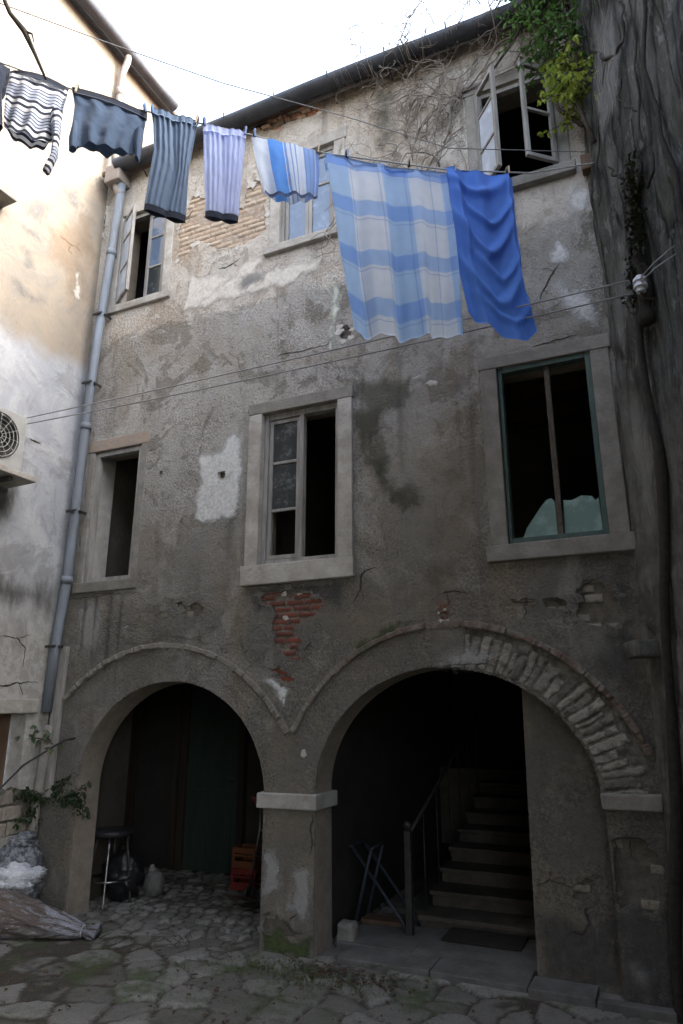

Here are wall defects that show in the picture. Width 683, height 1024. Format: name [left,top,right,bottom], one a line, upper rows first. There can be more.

flaking render [174,176,270,264]
crack [540,265,559,301]
spalling [333,324,355,344]
damp [357,378,415,507]
crack [354,567,376,601]
crack [0,635,35,695]
flaking render [252,584,328,688]